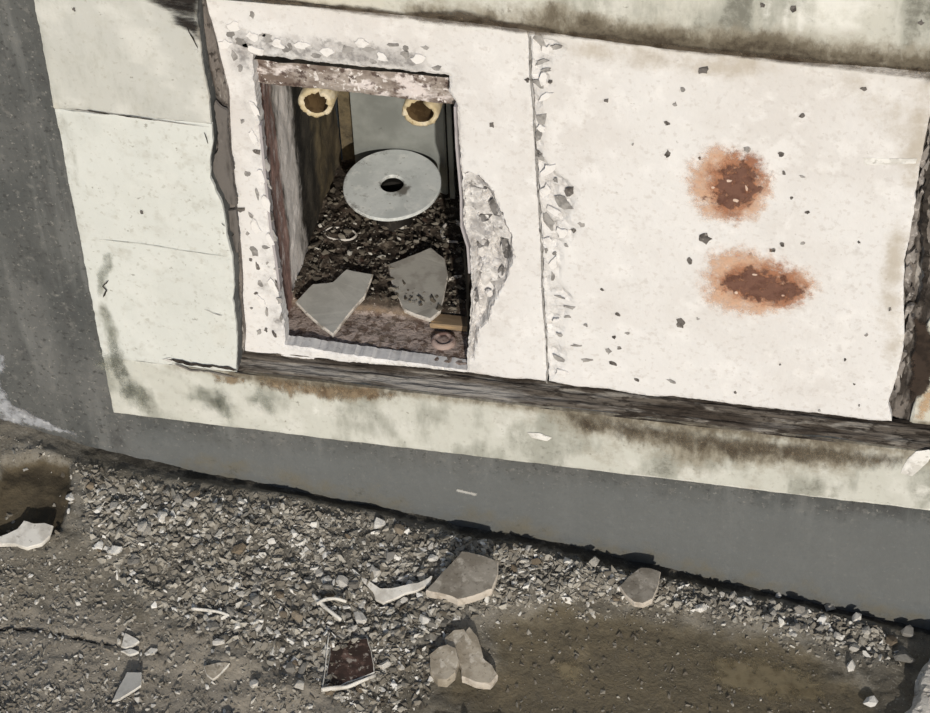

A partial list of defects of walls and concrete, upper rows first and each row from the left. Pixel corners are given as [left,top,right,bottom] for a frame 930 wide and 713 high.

crack [61,0,246,378]
spalling [464,171,513,358]
crack [252,0,930,421]
rust [690,148,770,218]
rust [704,251,814,314]
water stain [580,419,891,465]